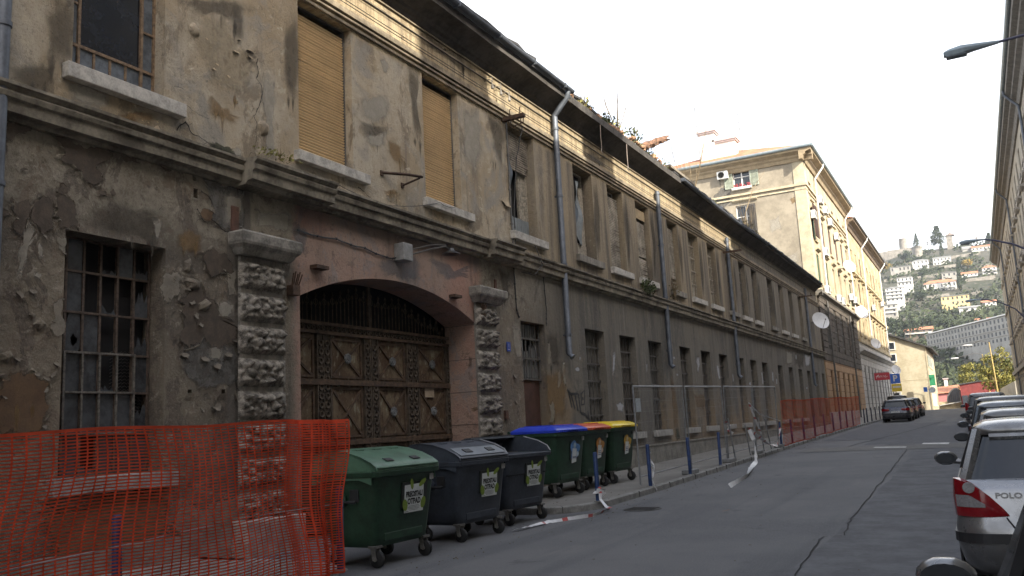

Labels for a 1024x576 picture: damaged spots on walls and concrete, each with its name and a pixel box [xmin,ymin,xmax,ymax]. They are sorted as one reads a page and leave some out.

water stain [194,1,241,38]
crack [174,84,223,151]
crack [250,59,263,156]
peeling [50,298,66,336]
spalling [160,270,238,370]